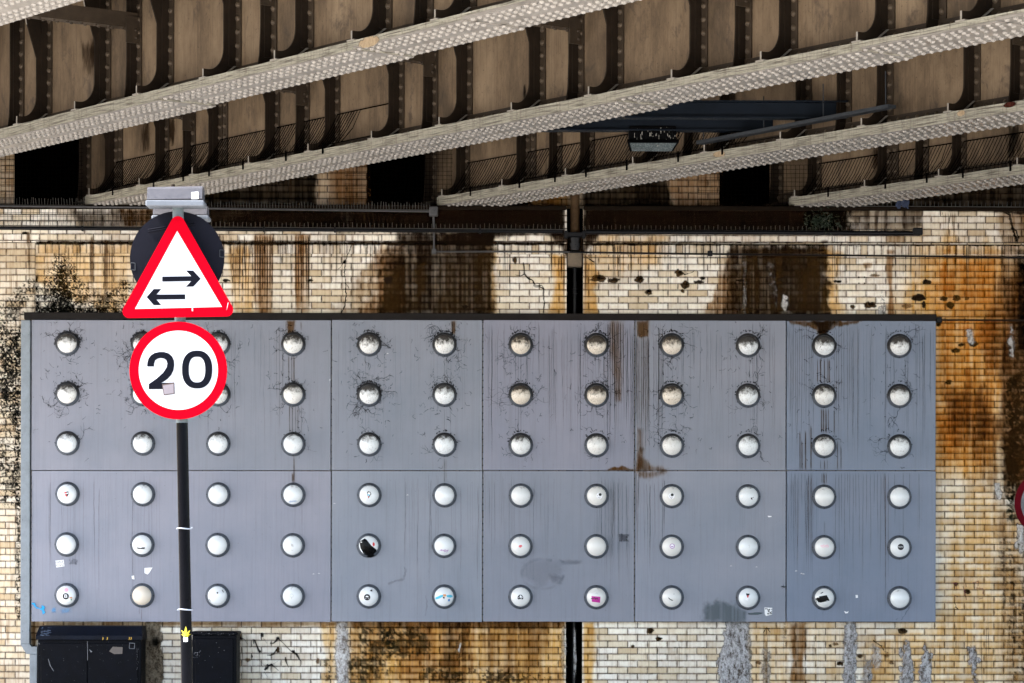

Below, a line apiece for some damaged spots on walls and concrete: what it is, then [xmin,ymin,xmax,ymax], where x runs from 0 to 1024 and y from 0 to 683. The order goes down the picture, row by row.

leakage [0,254,132,619]
crack [517,262,545,313]
leakage [205,174,1024,500]